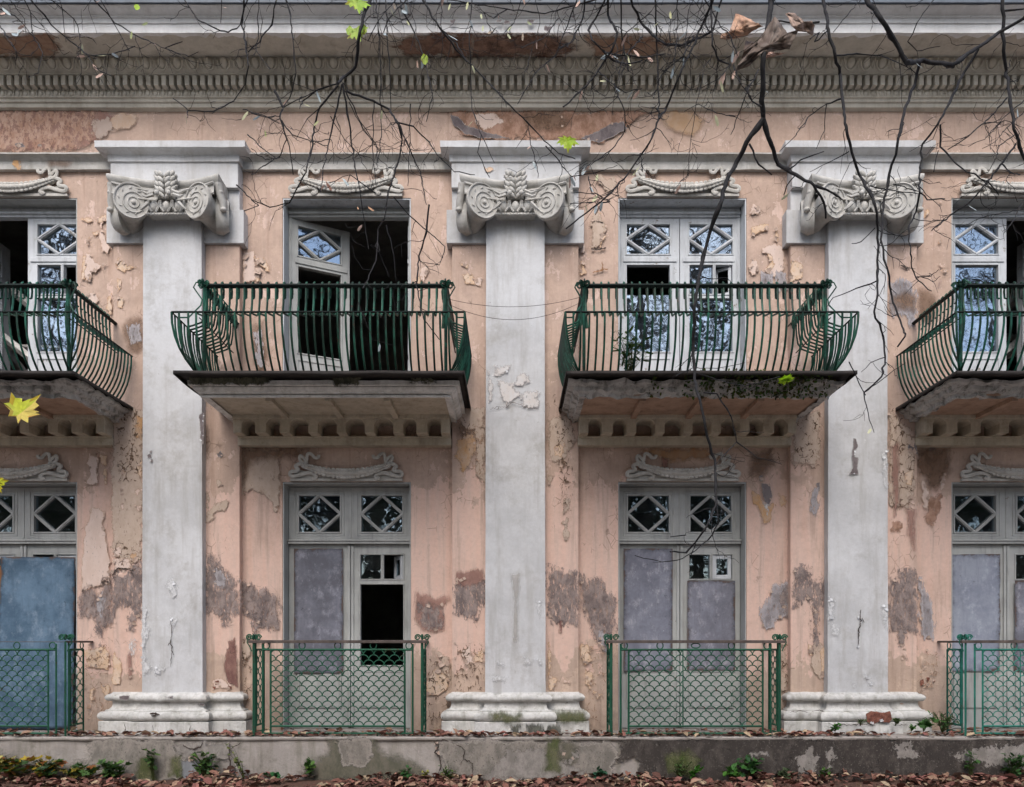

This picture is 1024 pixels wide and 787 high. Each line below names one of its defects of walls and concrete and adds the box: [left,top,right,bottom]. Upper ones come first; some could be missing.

spalling [0,110,137,152]
peeling [80,215,136,314]
spalling [849,438,859,475]
peeling [77,407,165,720]
spalling [206,552,282,702]
spalling [415,568,485,632]
crack [433,739,473,773]
spalling [545,563,618,721]
peeling [775,643,788,709]
spalling [759,563,841,679]
spalling [866,711,892,724]
spalling [880,568,938,692]